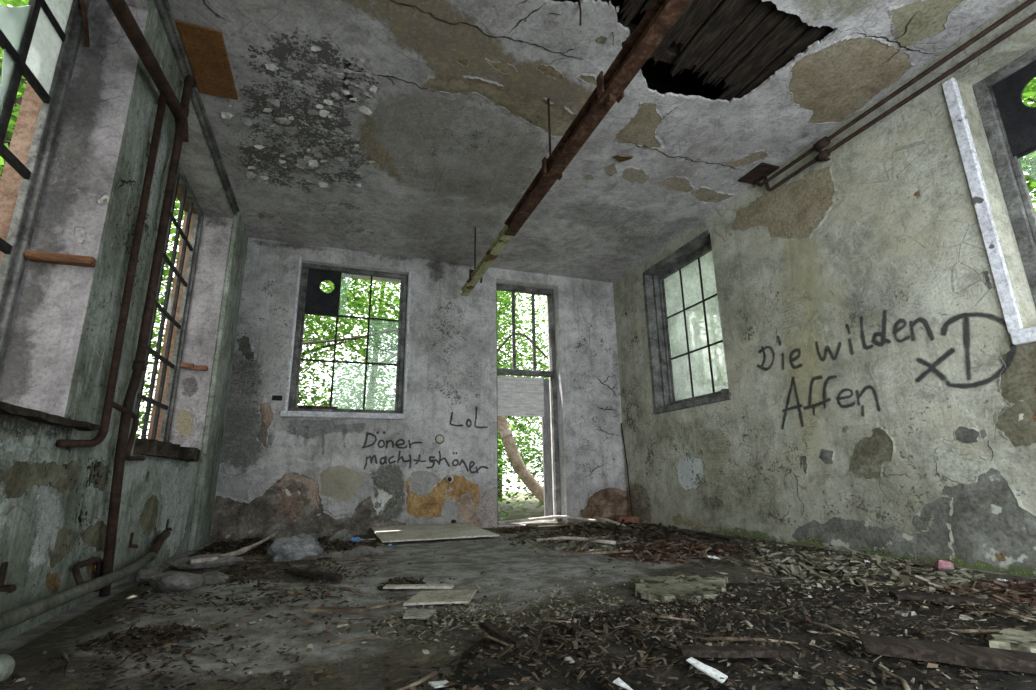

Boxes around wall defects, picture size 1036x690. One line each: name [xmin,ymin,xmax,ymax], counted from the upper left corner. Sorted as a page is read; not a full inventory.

crack [390,0,578,64]
leakage [219,0,592,206]
peeling [420,58,576,137]
peeling [613,101,664,149]
peeling [723,0,967,168]
peeling [584,163,837,243]
leakage [220,354,273,468]
spalling [269,474,320,523]
spalling [369,472,500,528]